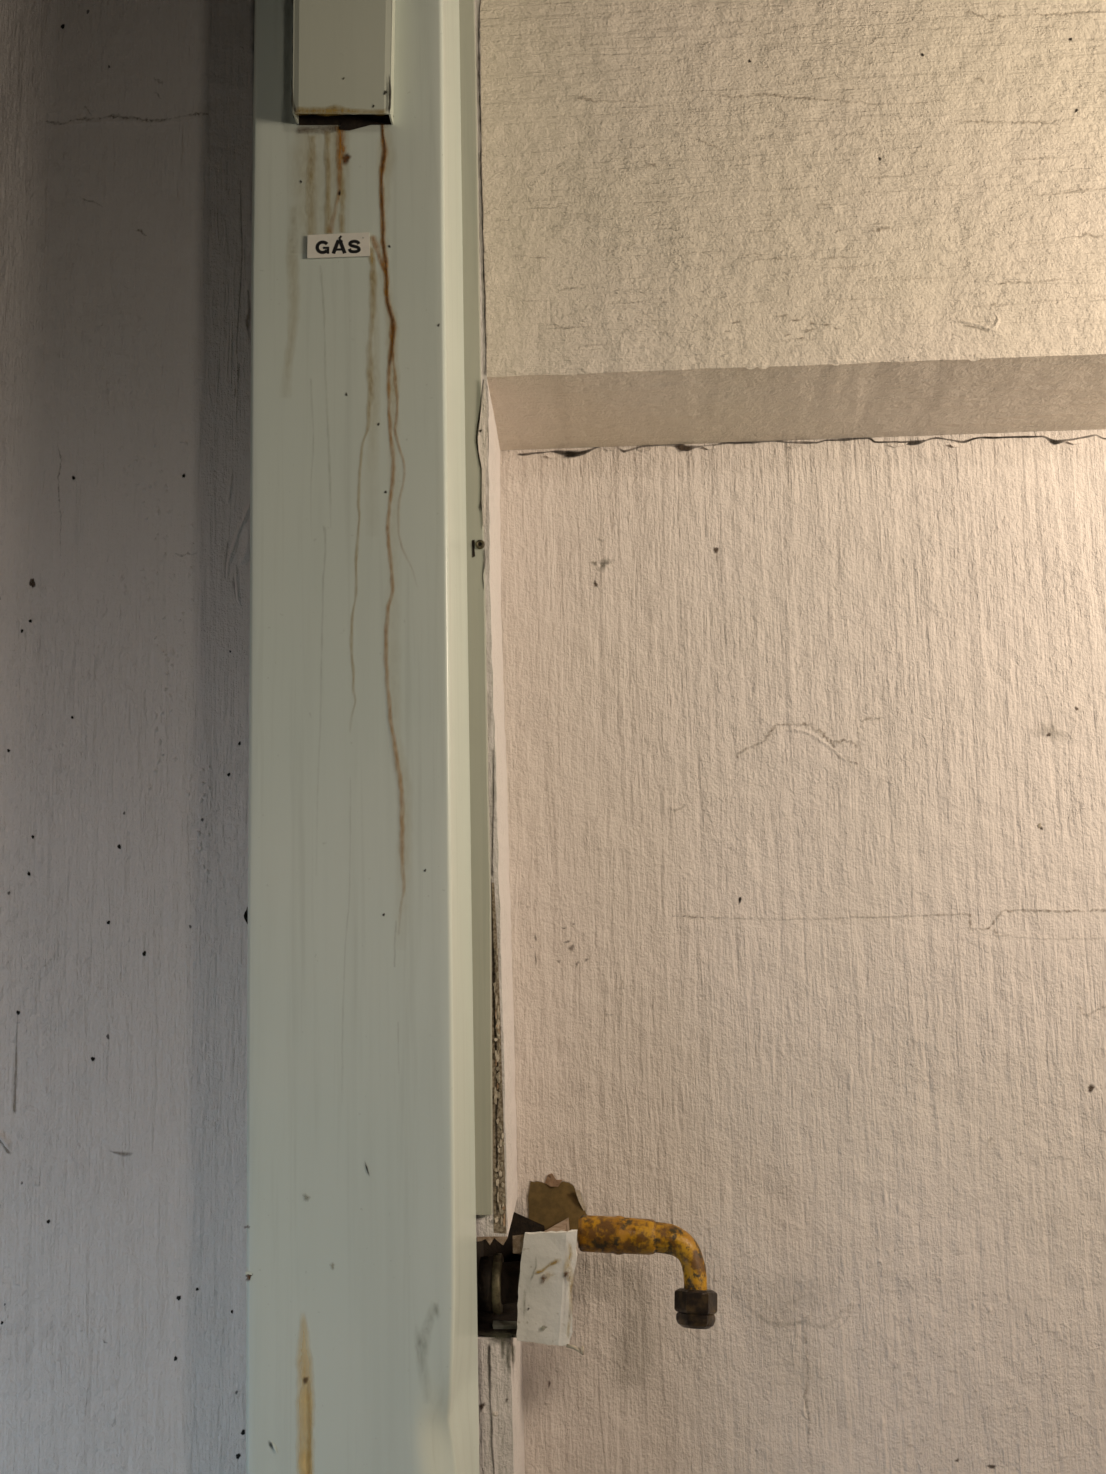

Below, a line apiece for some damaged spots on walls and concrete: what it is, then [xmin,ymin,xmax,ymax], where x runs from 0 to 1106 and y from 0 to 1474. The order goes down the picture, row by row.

corrosion [299,107,356,169]
corrosion [370,125,396,393]
crack [519,435,1106,458]
corrosion [299,1346,311,1474]